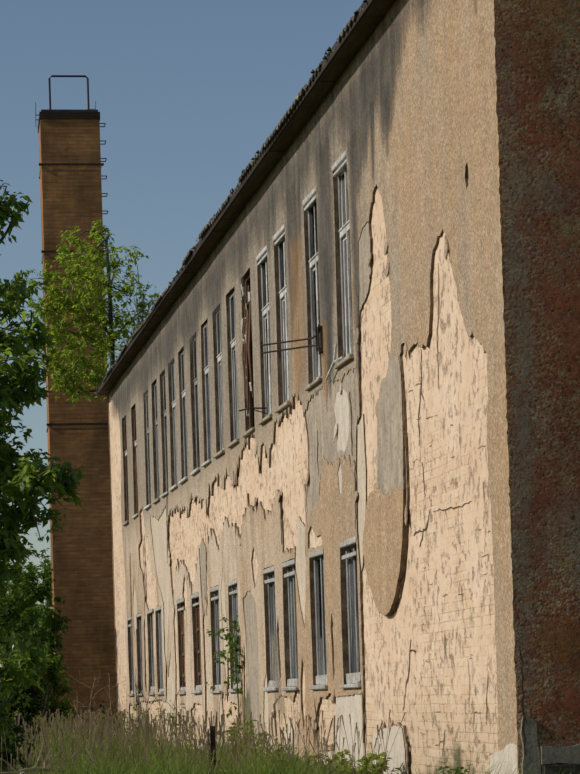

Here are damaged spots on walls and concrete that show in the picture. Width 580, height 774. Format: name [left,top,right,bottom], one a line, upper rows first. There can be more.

leakage [112,0,428,413]
flaking render [109,187,518,774]
crack [413,464,484,547]